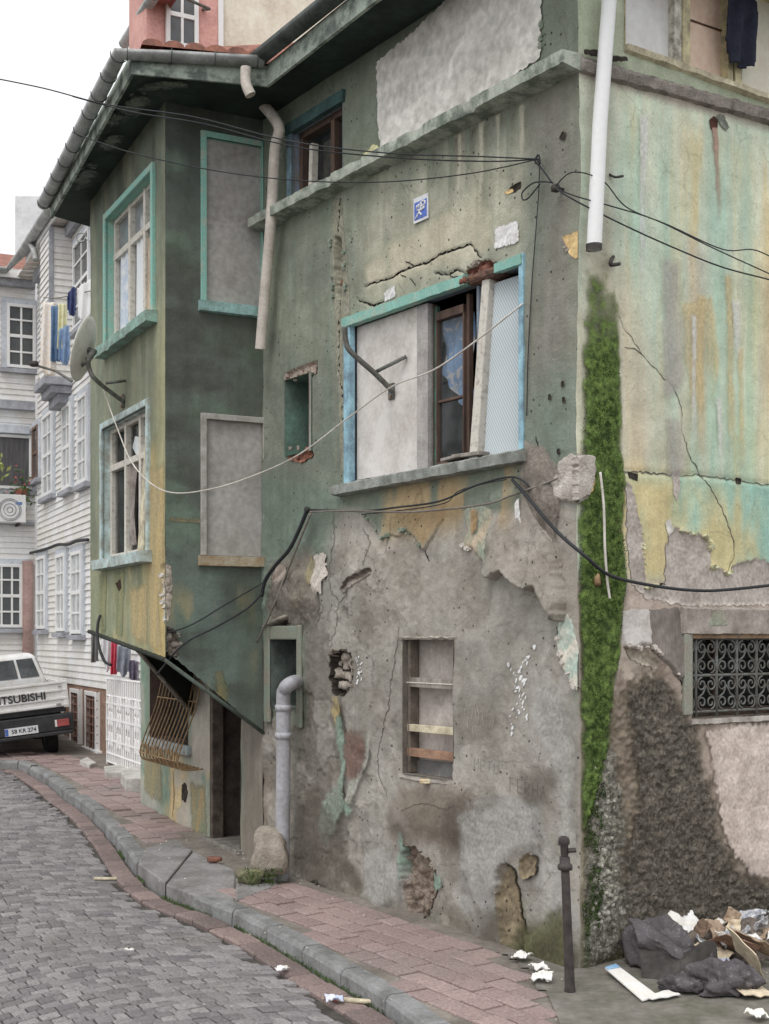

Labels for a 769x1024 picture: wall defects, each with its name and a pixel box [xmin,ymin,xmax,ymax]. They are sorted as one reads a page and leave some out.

rust [710,114,729,187]
crack [328,199,482,472]
crack [620,319,769,571]
peeling [336,486,444,561]
spalling [158,564,182,658]
peeling [304,553,328,594]
spalling [339,567,372,593]
peeling [459,474,582,693]
peeling [621,483,769,685]
water stain [508,673,769,967]
spalling [397,833,441,918]
spalling [493,852,538,946]